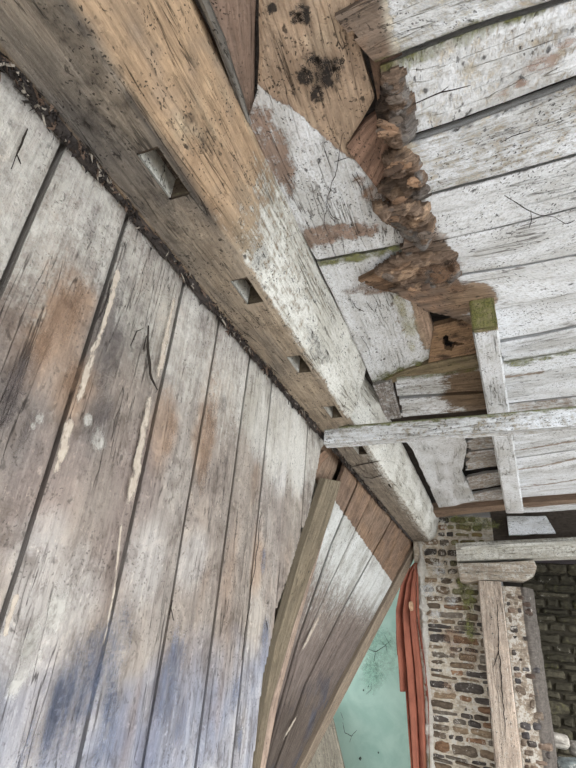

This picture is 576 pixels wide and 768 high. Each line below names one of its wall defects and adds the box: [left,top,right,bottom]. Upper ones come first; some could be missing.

damp [289,4,312,25]
damp [297,51,345,103]
peeling [376,93,404,138]
peeling [382,161,421,188]
crack [130,325,158,390]